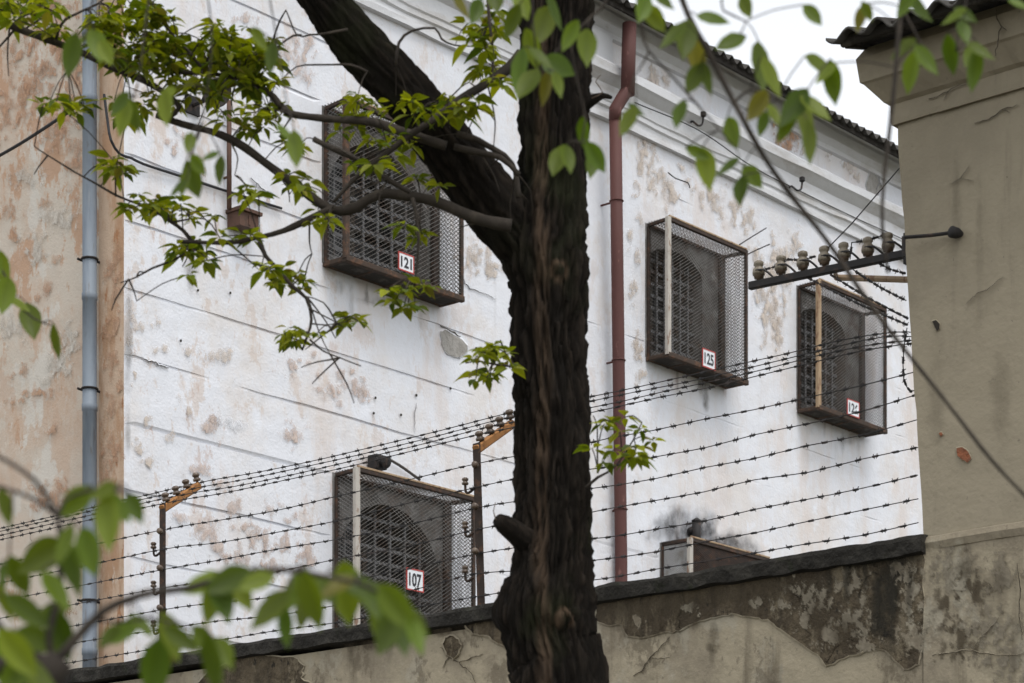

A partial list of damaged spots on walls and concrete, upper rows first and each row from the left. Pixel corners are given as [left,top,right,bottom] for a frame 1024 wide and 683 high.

peeling [0,0,82,171]
peeling [632,140,755,234]
peeling [4,319,80,405]
peeling [288,351,370,407]
peeling [203,414,217,433]
spalling [956,446,972,463]
spalling [595,545,1024,683]
crack [932,563,1024,656]
crack [440,647,482,683]